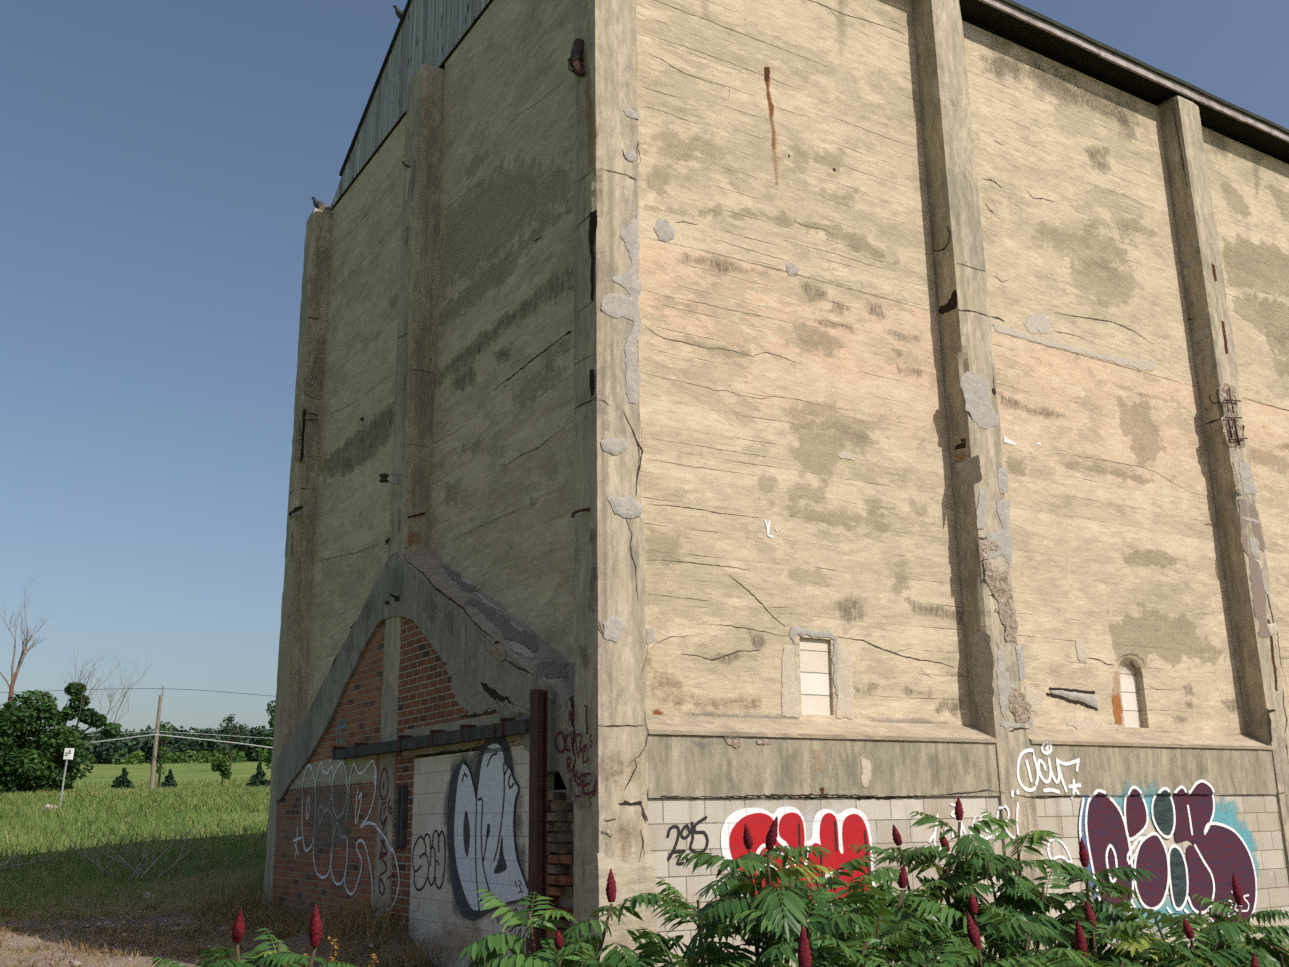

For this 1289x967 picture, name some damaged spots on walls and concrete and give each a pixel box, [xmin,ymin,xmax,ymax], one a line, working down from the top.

rust [764,67,775,149]
spalling [1204,383,1248,448]
peeling [1230,464,1278,637]
spalling [976,487,1032,732]
crack [837,636,954,678]